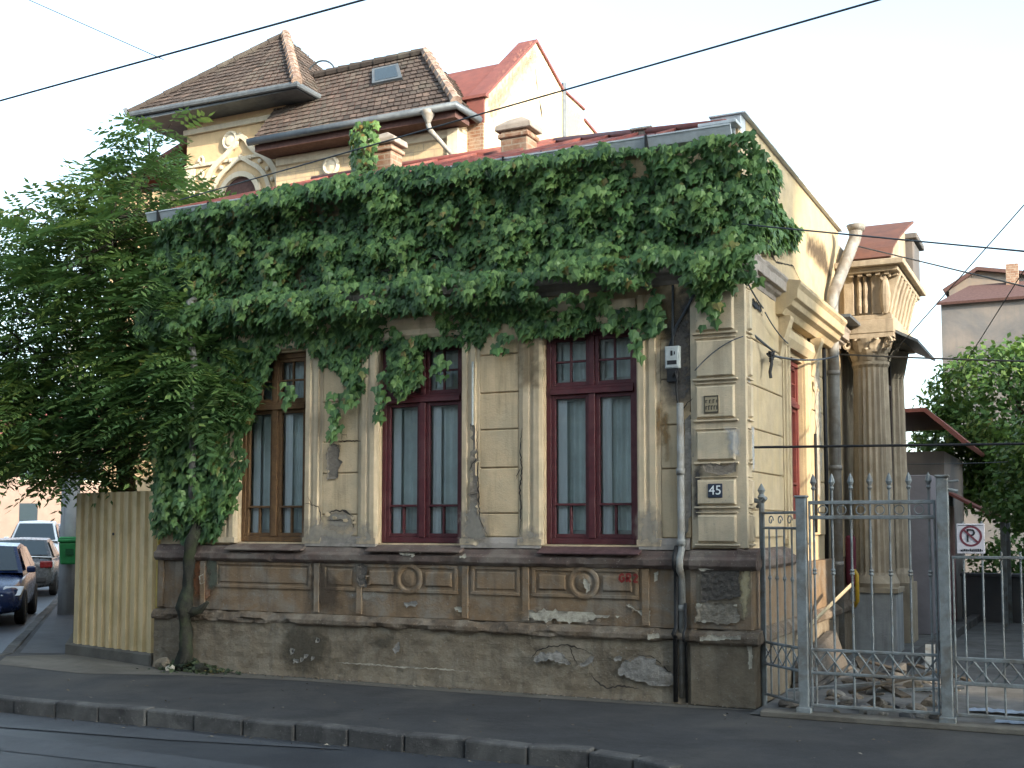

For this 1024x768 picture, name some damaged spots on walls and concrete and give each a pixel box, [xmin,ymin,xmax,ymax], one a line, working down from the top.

flaking render [325,441,342,480]
flaking render [459,424,485,558]
peeling [519,608,619,625]
flaking render [694,568,753,669]